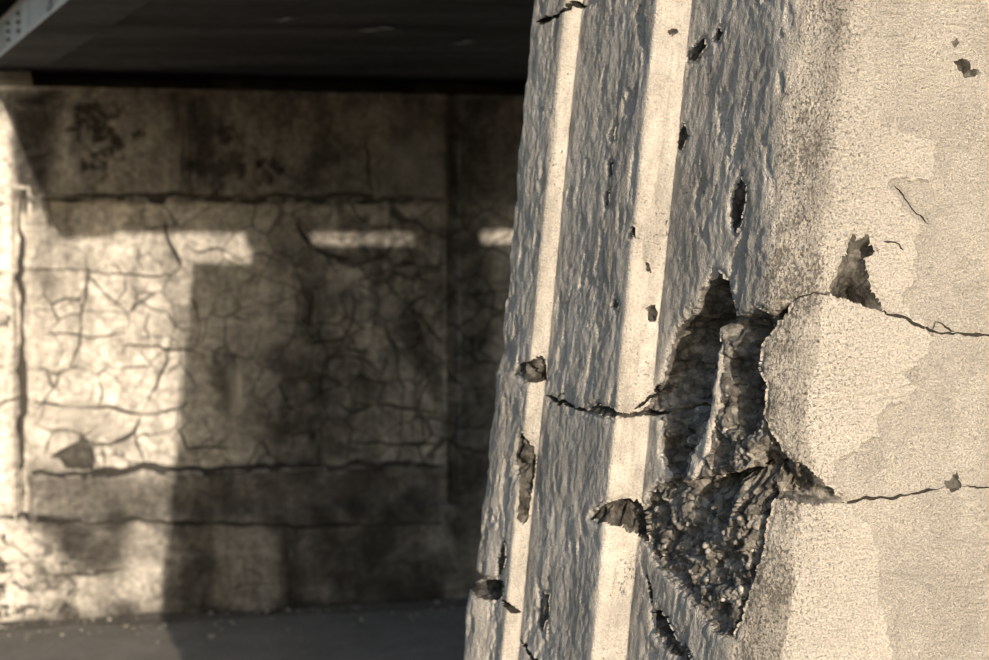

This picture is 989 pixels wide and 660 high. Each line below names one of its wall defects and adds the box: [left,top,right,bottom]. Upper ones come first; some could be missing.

crack [536,0,588,25]
damp [11,90,145,210]
damp [171,91,284,195]
crack [0,220,283,466]
flaking render [587,0,938,660]
crack [884,310,989,337]
crack [546,393,587,412]
crack [634,384,670,416]
spalling [516,433,538,525]
damp [59,518,122,567]
damp [180,551,240,614]
damp [273,515,440,611]